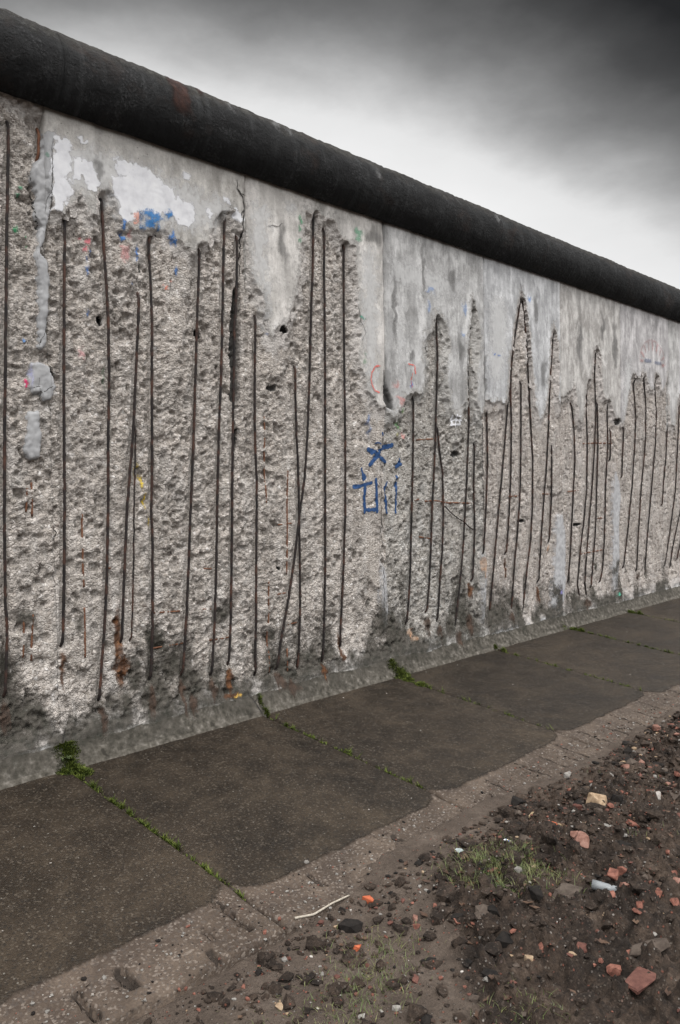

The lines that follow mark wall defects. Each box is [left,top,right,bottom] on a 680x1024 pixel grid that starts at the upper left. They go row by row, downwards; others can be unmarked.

spalling [0,92,680,748]
rust [112,615,130,686]
rust [209,670,239,700]